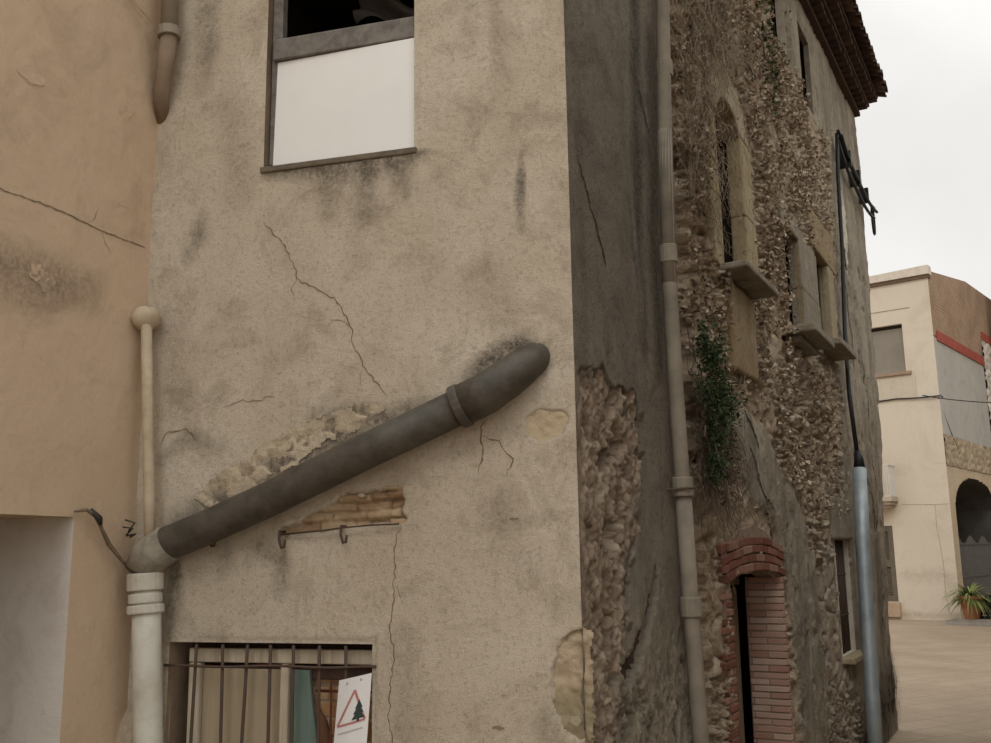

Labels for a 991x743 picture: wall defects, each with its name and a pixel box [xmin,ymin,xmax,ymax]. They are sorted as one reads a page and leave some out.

crack [0,187,145,252]
crack [577,155,606,265]
crack [262,221,388,396]
flaking render [193,401,385,507]
flaking render [281,485,407,538]
flaking render [553,364,645,743]
crack [387,528,403,743]